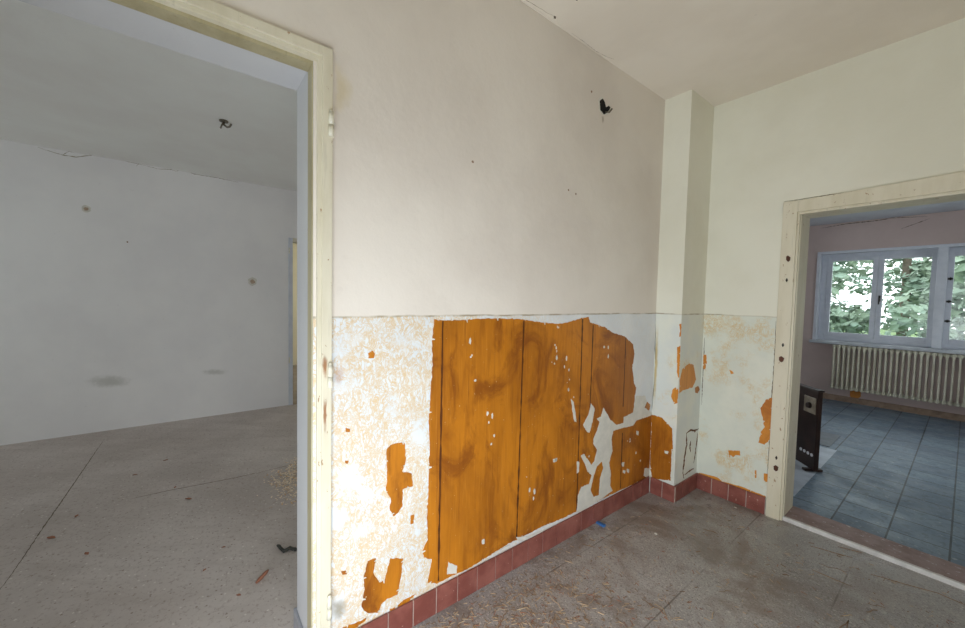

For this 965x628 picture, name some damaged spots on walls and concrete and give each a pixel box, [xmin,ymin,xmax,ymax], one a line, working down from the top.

peeling [671,324,707,404]
peeling [385,442,413,516]
peeling [422,317,674,584]
peeling [758,398,772,445]
peeling [343,558,414,628]